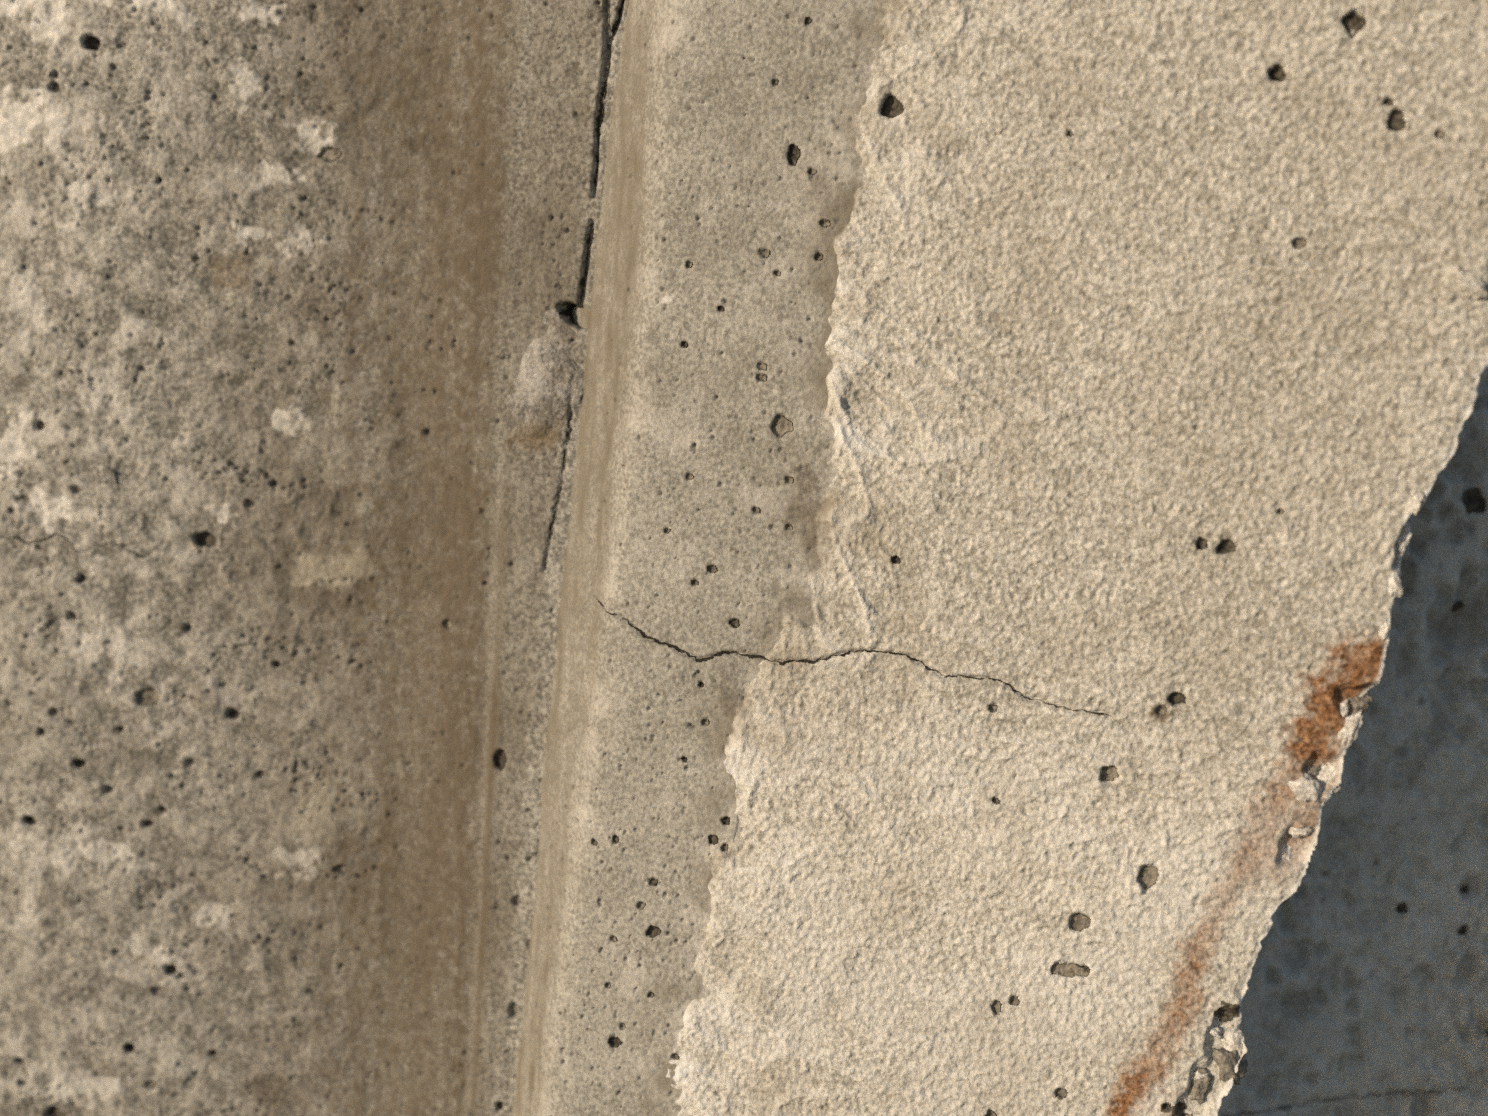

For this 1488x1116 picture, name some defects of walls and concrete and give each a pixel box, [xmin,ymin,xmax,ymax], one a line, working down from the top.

crack [594,0,624,187]
crack [580,223,593,308]
crack [544,411,572,568]
spalling [1388,490,1426,598]
crack [595,598,1125,729]
spalling [1379,618,1391,640]
spalling [1338,690,1374,747]
spalling [1288,763,1345,803]
rust [1090,623,1390,1116]
spalling [1279,826,1313,860]
spalling [1160,1001,1248,1116]